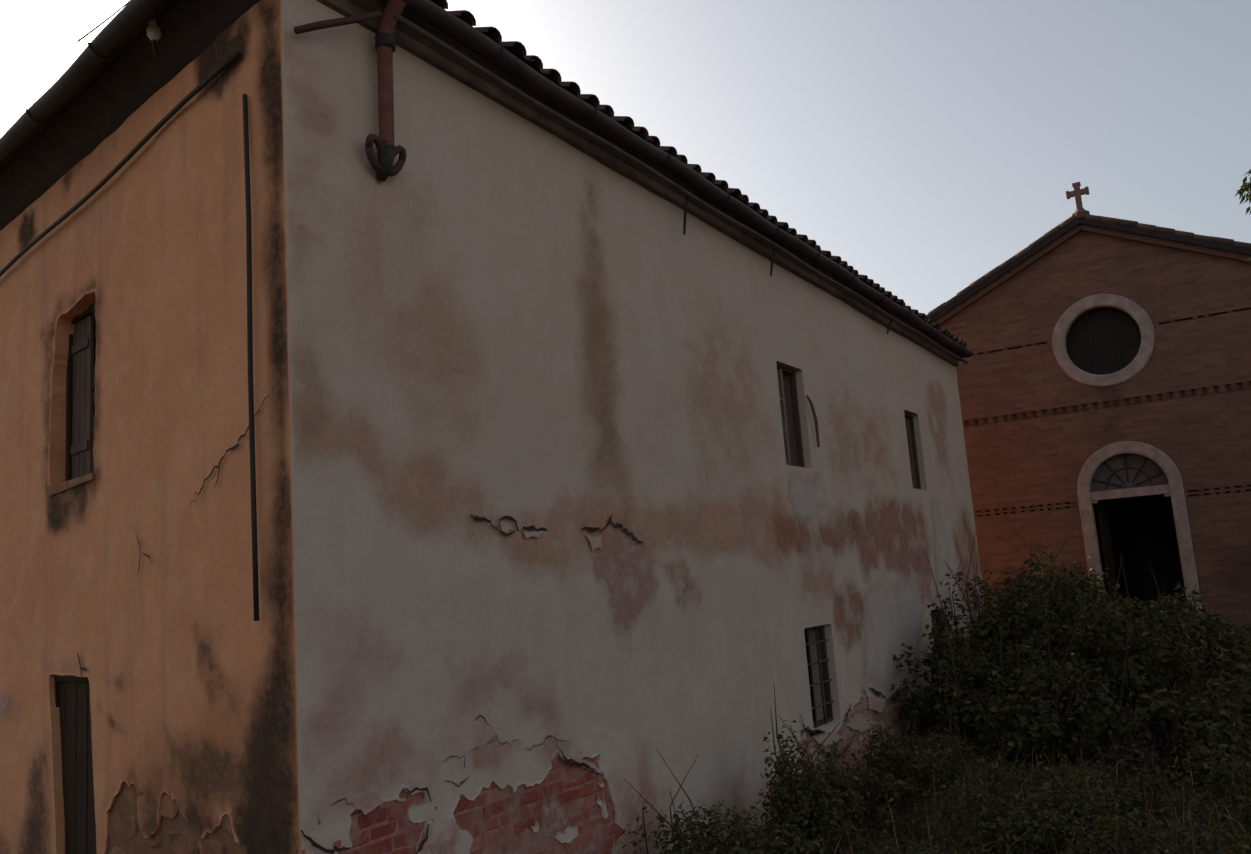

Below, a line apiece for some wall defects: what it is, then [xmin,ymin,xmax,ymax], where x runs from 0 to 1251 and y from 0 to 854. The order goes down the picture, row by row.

leakage [197,19,247,97]
leakage [260,2,287,428]
leakage [47,467,98,531]
crack [190,395,269,505]
leakage [581,235,656,628]
leakage [776,501,932,601]
leakage [170,458,297,854]
flaking render [799,684,913,787]
leakage [20,757,45,854]
flaking render [106,781,246,854]
flaking render [295,735,626,854]